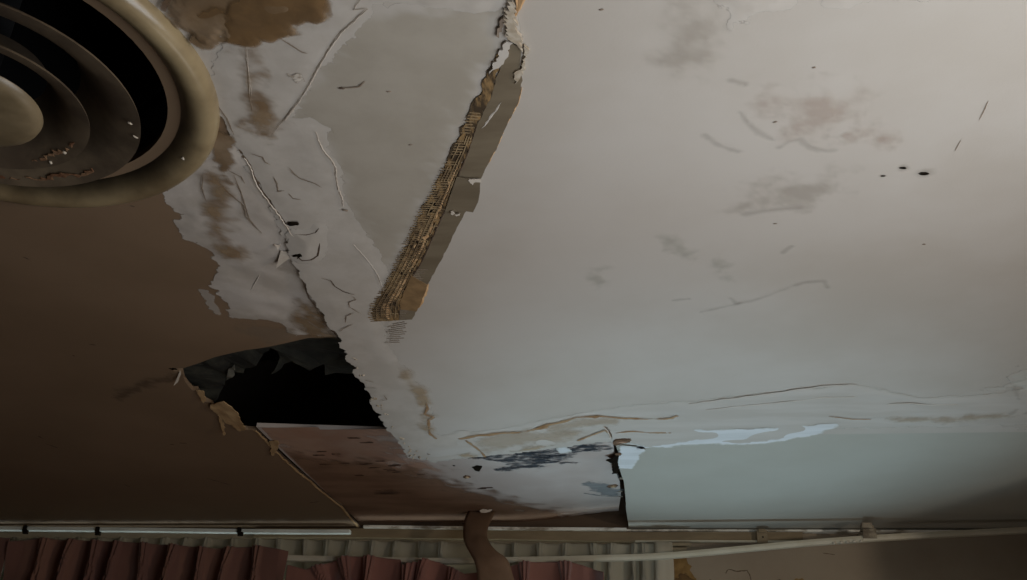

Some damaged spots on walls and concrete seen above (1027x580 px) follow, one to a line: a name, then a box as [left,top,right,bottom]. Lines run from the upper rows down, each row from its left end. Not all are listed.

water stain [160,0,330,50]
water stain [262,427,570,522]
water stain [471,444,610,471]
water stain [582,482,619,497]